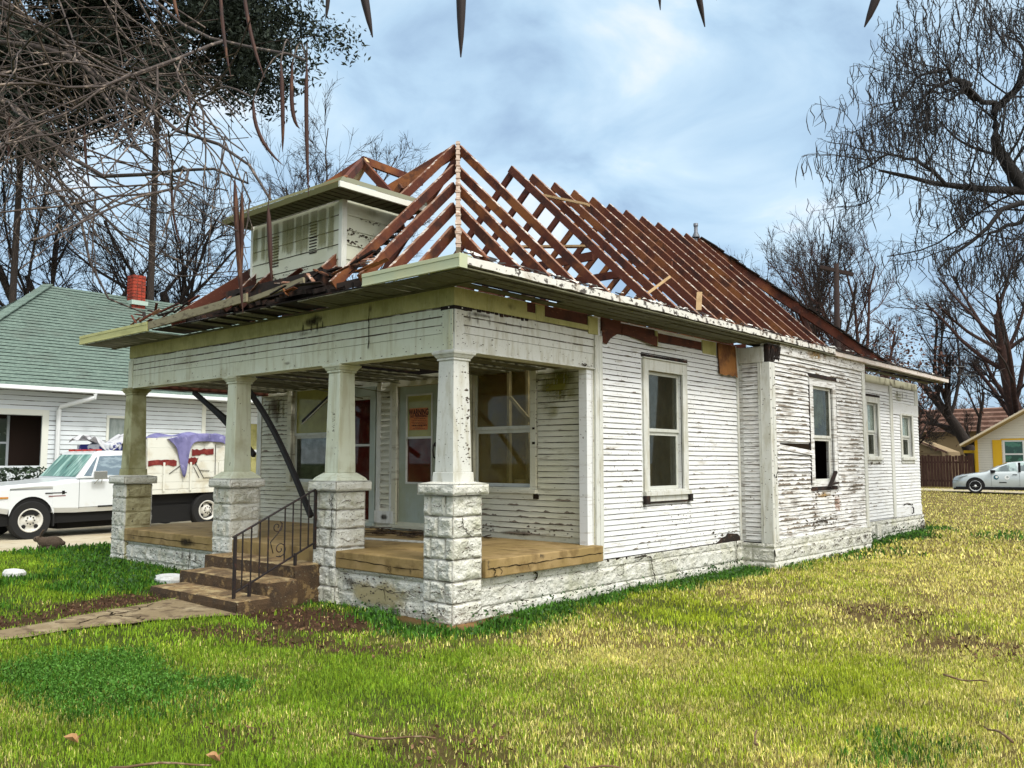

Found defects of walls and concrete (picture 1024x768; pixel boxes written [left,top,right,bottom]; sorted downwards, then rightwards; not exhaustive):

peeling [751,346,888,564]
peeling [432,498,573,569]
crack [459,552,656,593]
spalling [561,503,739,587]